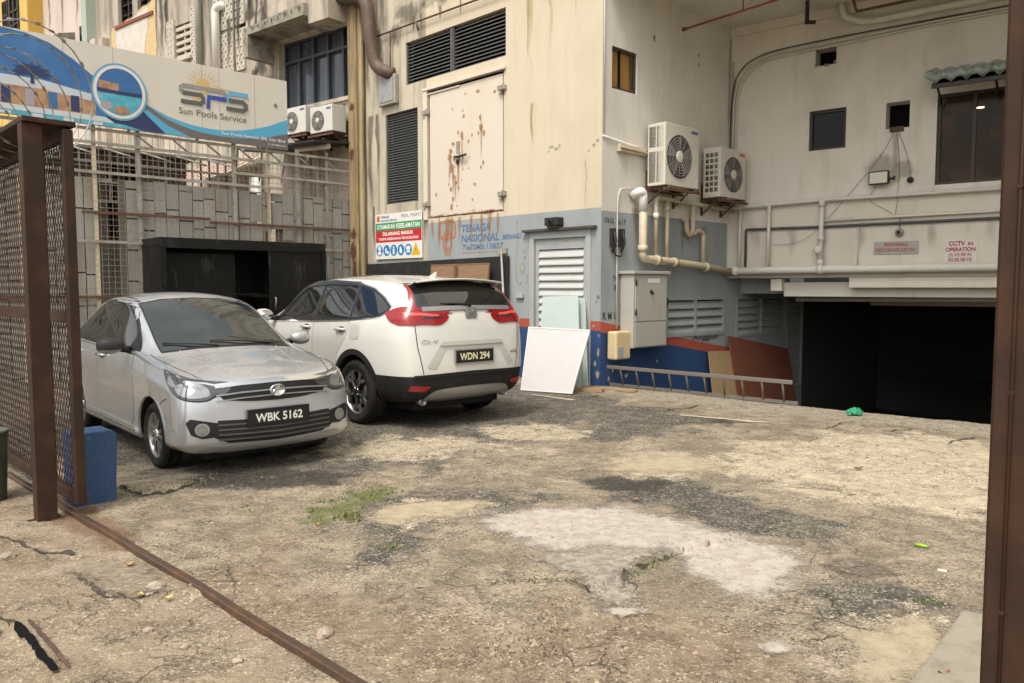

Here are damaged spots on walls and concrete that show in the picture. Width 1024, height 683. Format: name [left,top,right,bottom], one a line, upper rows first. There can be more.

rust [428,115,502,218]
crack [117,480,200,497]
crack [0,535,159,608]